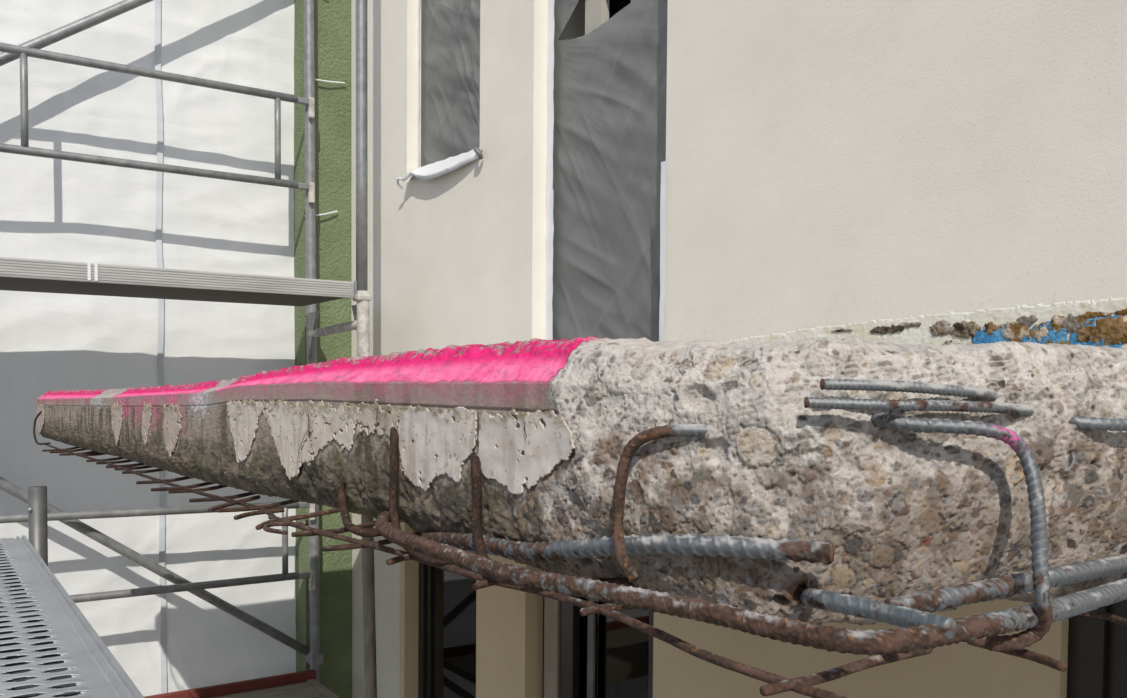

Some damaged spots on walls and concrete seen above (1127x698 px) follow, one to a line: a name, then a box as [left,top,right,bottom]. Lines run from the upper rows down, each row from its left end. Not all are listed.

spalling [36,297,1127,626]